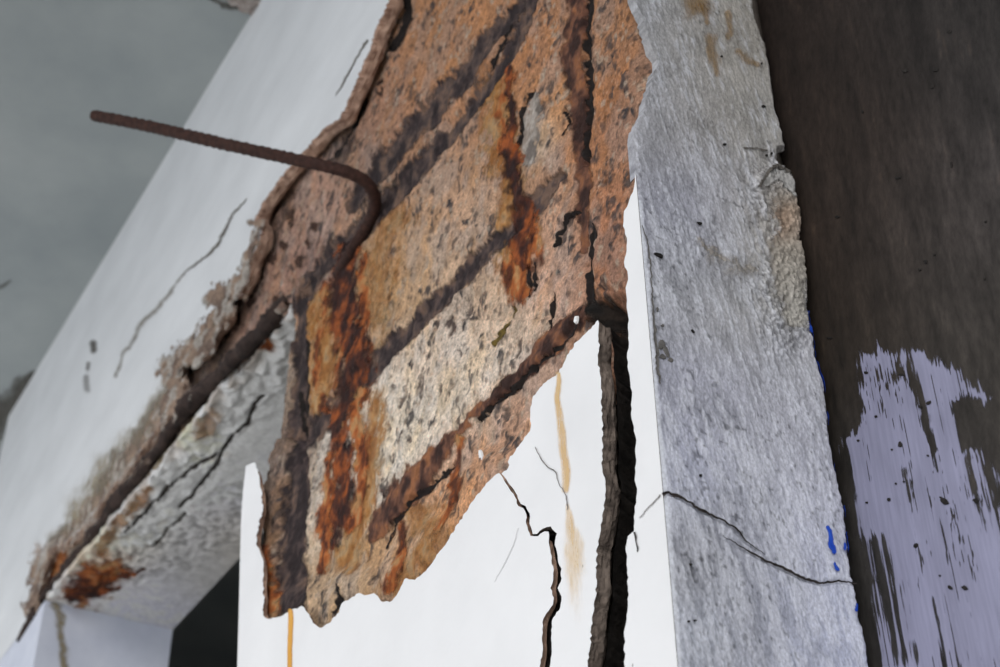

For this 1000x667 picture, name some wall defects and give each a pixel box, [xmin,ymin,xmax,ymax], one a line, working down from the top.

crack [114,199,247,377]
spalling [17,0,652,642]
crack [124,395,265,547]
crack [510,485,562,667]
crack [535,447,568,509]
crack [605,329,857,667]